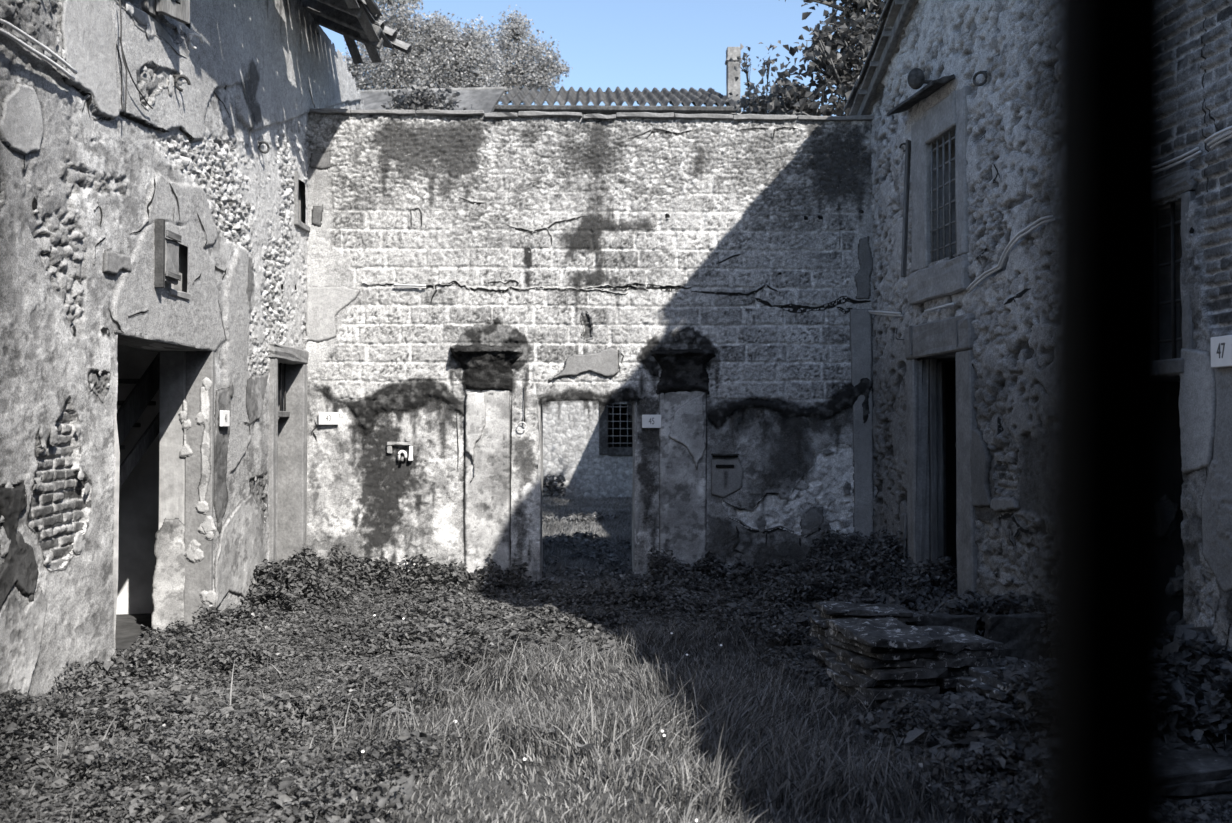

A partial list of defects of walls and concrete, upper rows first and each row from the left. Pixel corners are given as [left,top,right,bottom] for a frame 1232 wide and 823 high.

water stain [374,121,485,205]
water stain [561,122,653,302]
water stain [806,125,872,220]
crack [362,253,871,314]
flaking render [88,368,111,402]
flaking render [0,395,92,609]
water stain [328,400,456,567]
flaking render [1175,565,1220,632]